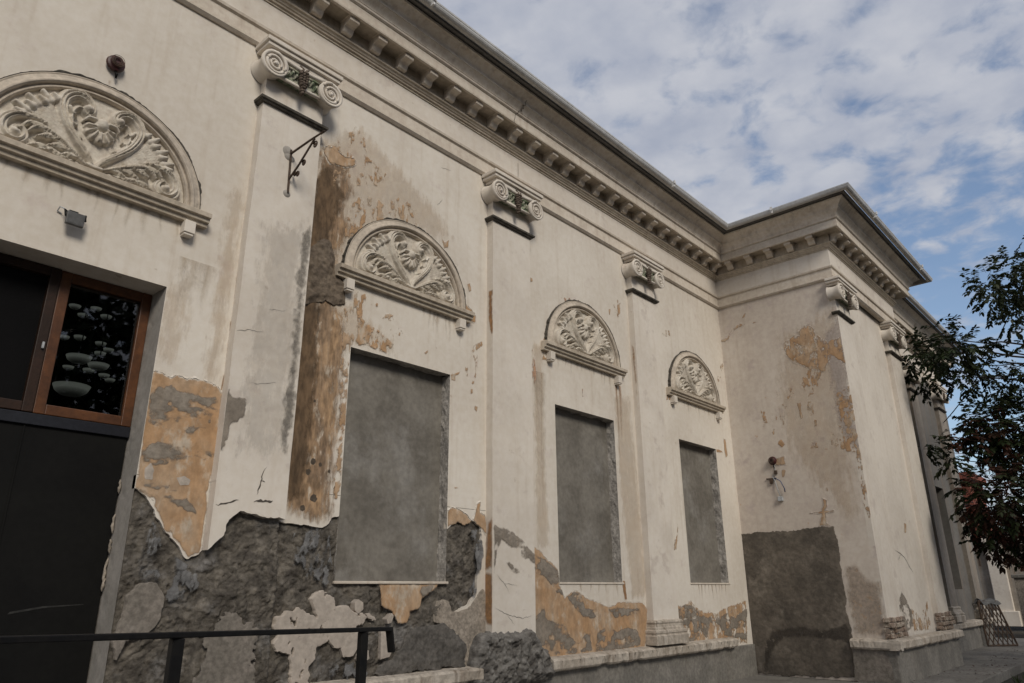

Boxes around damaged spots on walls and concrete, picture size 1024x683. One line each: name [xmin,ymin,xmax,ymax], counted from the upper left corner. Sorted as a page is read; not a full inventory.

peeling [323,130,386,186]
peeling [345,197,414,237]
water stain [282,150,352,521]
peeling [334,294,400,499]
peeling [782,324,846,426]
crack [216,468,272,505]
flaking render [103,370,486,683]
peeling [831,387,871,518]
peeling [535,547,647,656]
peeling [678,600,748,645]